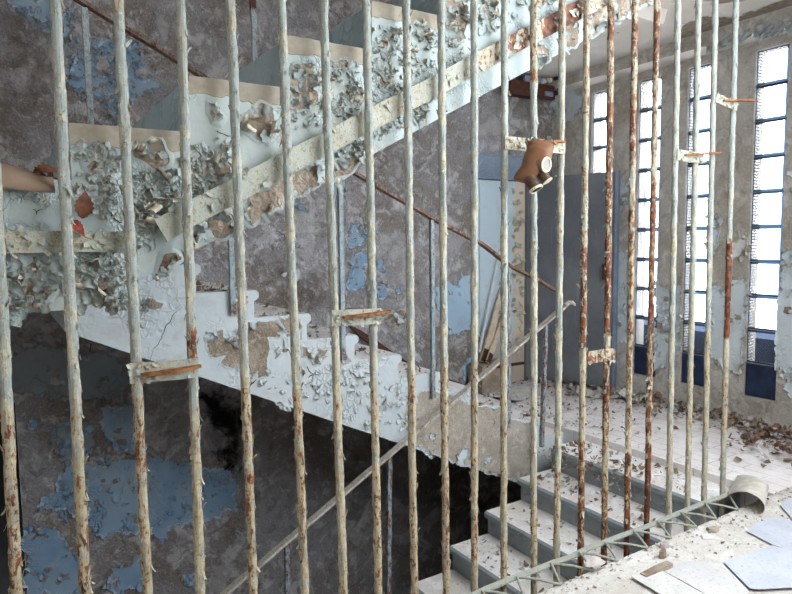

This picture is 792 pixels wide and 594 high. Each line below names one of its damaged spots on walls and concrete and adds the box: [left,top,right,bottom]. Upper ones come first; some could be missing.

peeling [289,0,557,130]
peeling [565,0,654,55]
peeling [131,99,235,281]
peeling [240,98,435,229]
peeling [6,252,64,327]
peeling [11,343,69,406]
peeling [74,252,128,317]
peeling [78,350,239,545]
leakage [199,389,242,472]
peeling [203,314,531,482]
peeling [774,247,792,398]
peeling [21,524,80,594]